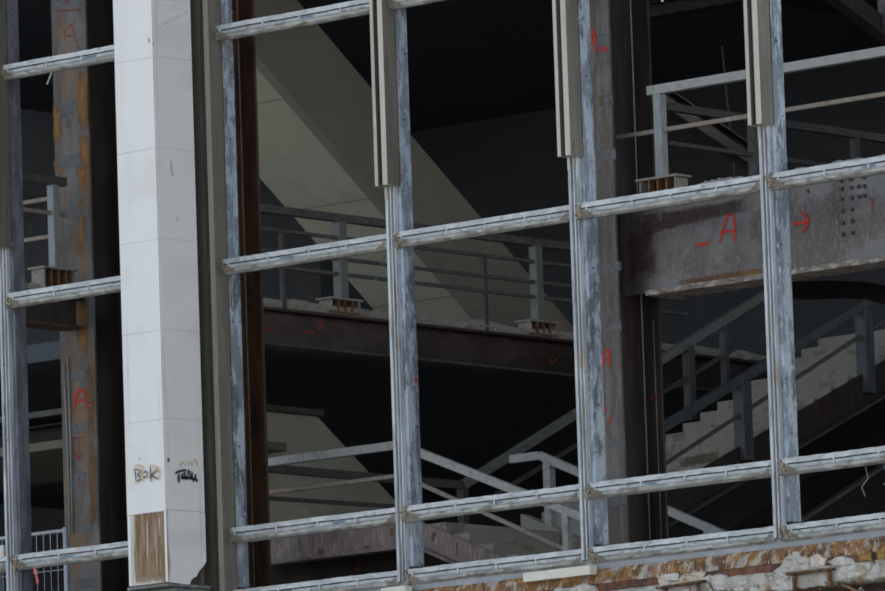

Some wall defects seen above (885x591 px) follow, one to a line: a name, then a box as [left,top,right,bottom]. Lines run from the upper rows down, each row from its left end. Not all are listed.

rust [53,108,61,139]
rust [77,76,87,126]
rust [78,136,89,190]
spalling [554,583,599,591]
rust [412,536,885,591]
spalling [641,551,885,591]